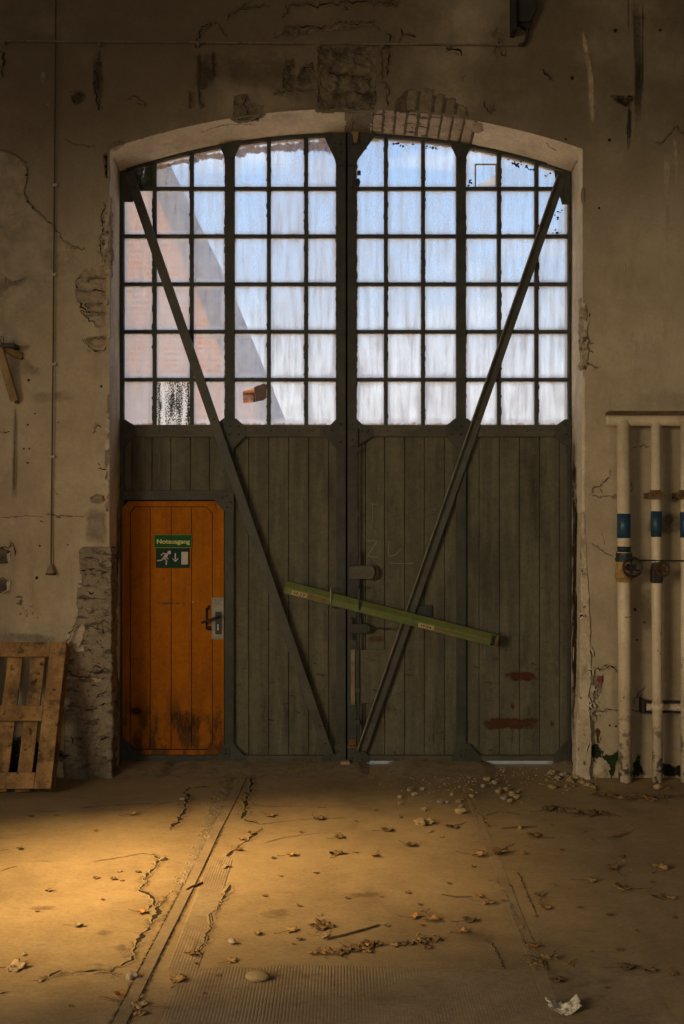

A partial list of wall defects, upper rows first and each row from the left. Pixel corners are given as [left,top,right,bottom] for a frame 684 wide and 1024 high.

spalling [230,44,478,144]
flaking render [0,149,114,354]
spalling [578,297,617,512]
flaking render [590,664,608,703]
crack [165,786,209,831]
crack [222,777,349,857]
crack [0,853,171,1011]
crack [194,883,235,958]